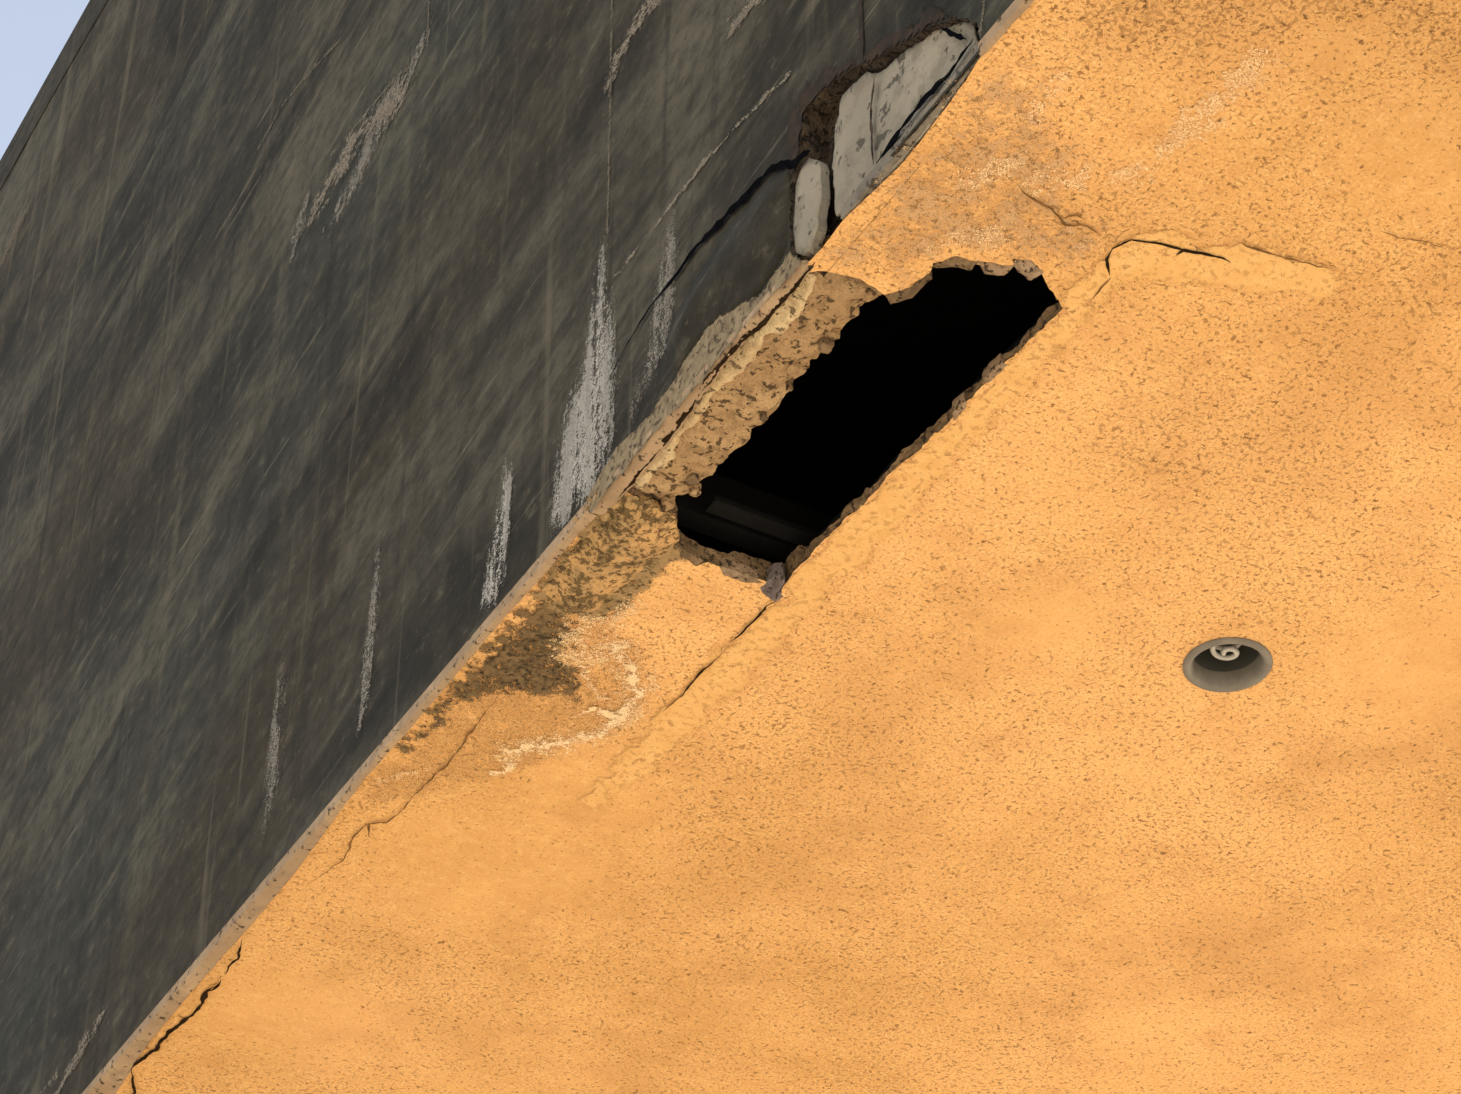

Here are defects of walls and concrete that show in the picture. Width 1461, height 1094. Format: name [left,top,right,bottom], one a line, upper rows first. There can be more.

spalling [587,17,1058,583]
crack [1018,185,1327,299]
leakage [356,526,382,737]
leakage [361,455,664,811]
crack [660,600,782,713]
crack [307,684,506,886]
crack [131,940,242,1094]